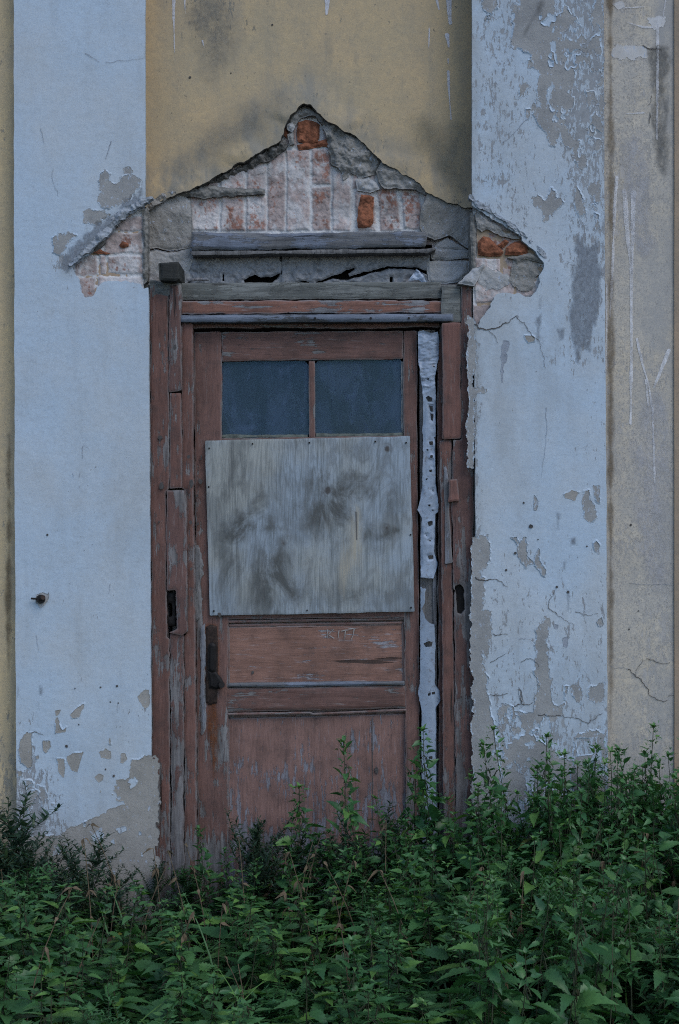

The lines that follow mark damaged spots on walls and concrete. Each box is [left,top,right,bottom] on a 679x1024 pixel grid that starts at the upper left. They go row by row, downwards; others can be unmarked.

peeling [481,0,648,170]
spalling [51,106,543,469]
crack [474,316,546,368]
peeling [561,238,601,358]
peeling [563,485,601,523]
peeling [17,702,86,813]
peeling [469,534,607,865]
crack [611,659,674,702]
peeling [6,738,161,944]